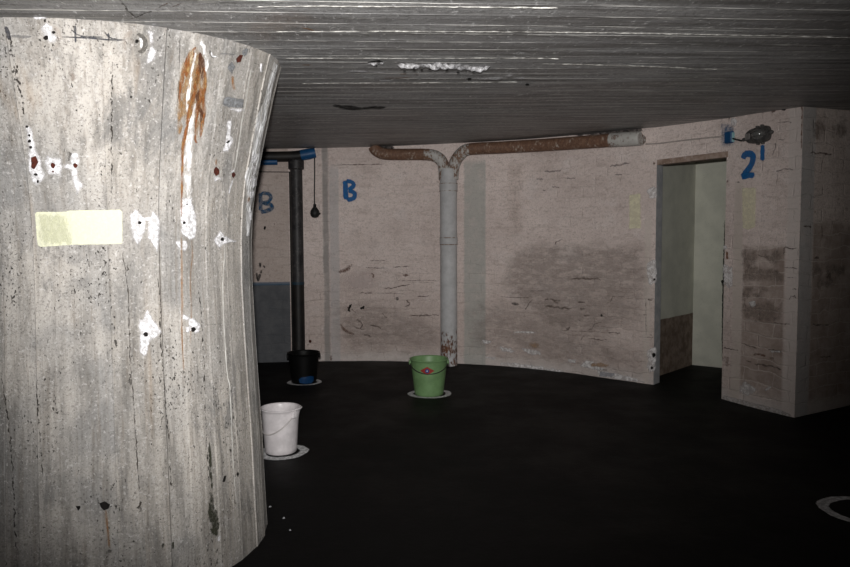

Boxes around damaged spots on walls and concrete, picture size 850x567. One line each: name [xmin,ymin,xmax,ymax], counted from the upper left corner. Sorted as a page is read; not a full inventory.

corrosion [178,41,209,157]
spalling [398,62,529,86]